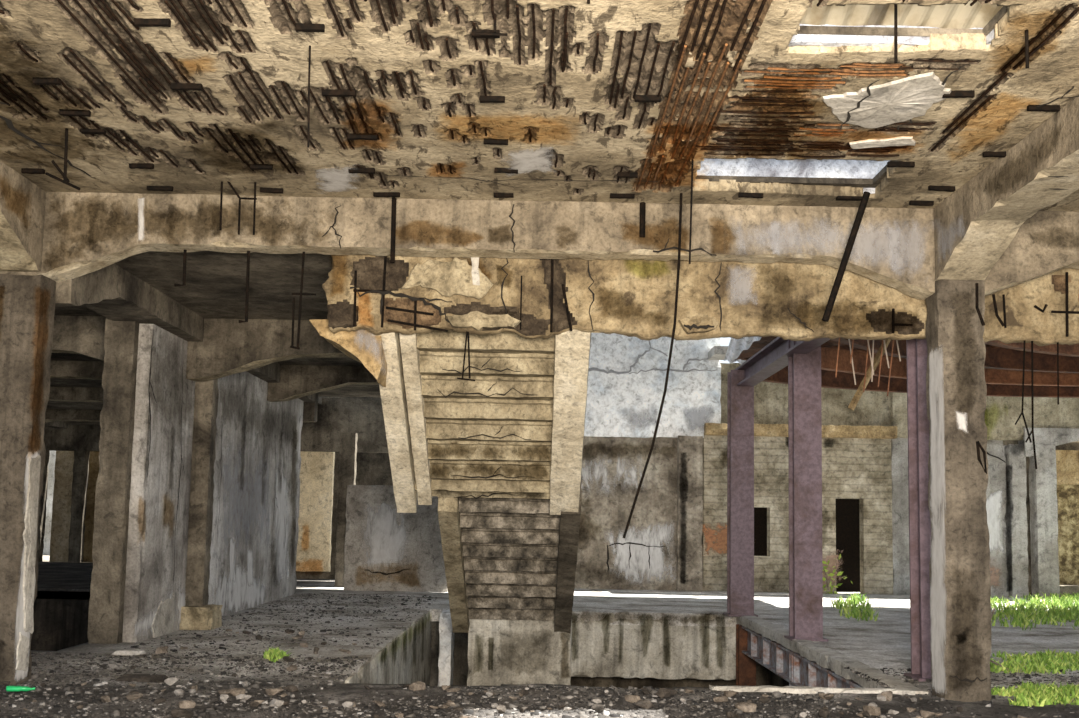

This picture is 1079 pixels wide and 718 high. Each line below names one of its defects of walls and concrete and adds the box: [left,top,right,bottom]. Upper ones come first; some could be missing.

spalling [0,0,1079,195]
peeling [310,256,577,387]
spalling [1051,272,1079,337]
water stain [580,438,688,584]
water stain [986,436,1024,591]
water stain [562,611,650,676]
water stain [682,613,724,666]